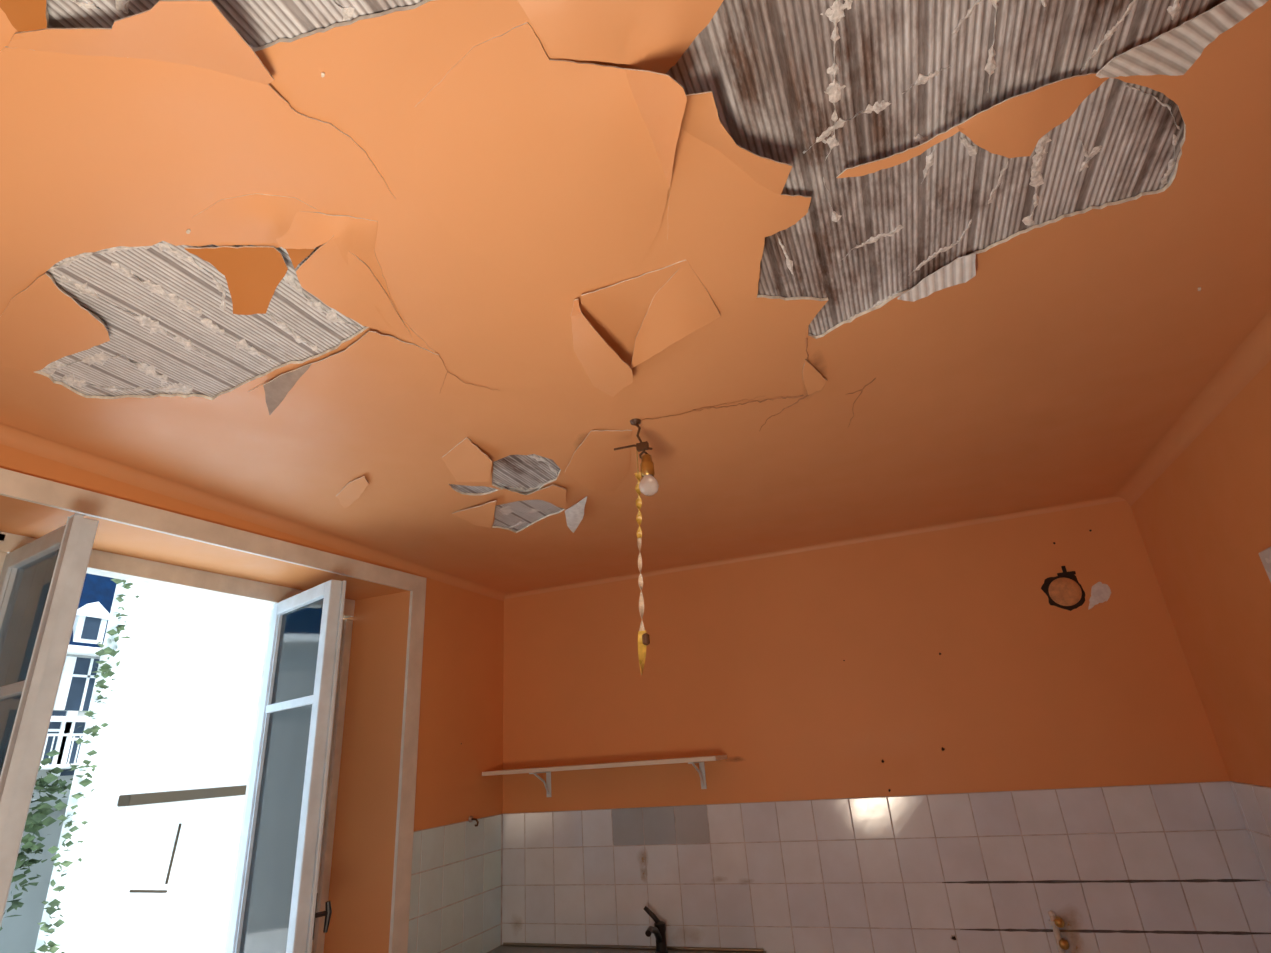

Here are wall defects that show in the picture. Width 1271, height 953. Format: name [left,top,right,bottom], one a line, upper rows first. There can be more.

peeling [0,0,423,199]
peeling [414,0,1268,397]
peeling [0,211,440,415]
peeling [442,430,632,533]
crack [643,395,809,432]